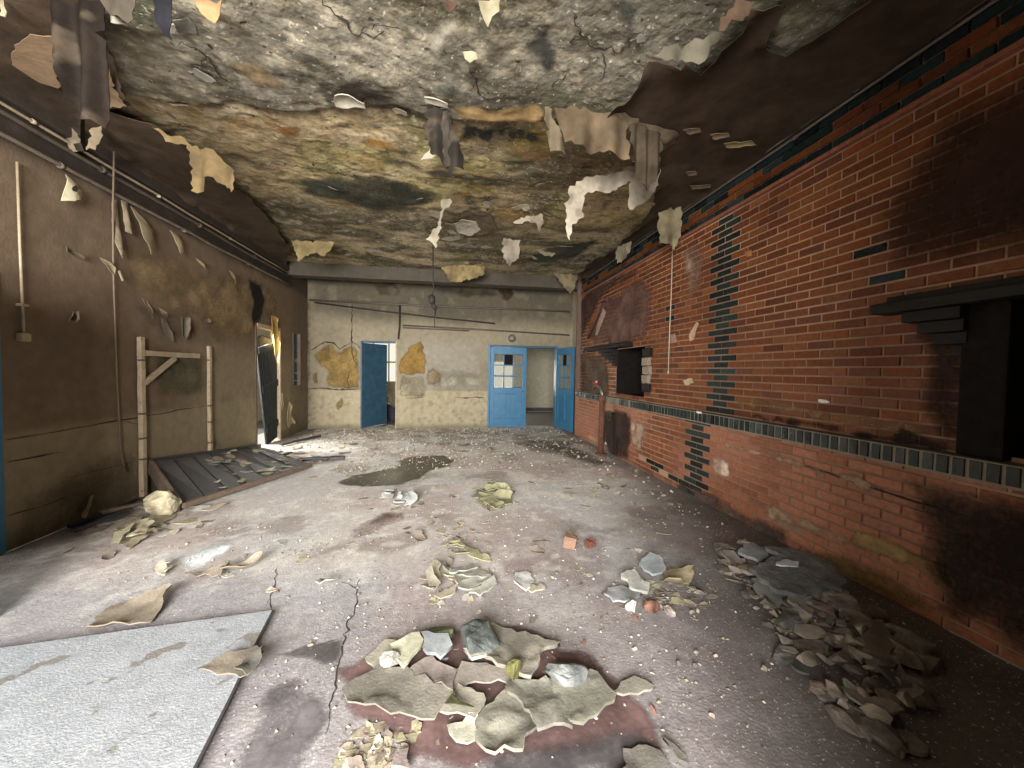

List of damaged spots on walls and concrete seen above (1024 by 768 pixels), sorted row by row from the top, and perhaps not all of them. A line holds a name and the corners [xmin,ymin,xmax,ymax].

crack [322,0,403,39]
peeling [0,0,365,269]
spalling [334,81,407,116]
peeling [420,0,991,294]
water stain [296,175,433,211]
peeling [100,200,156,281]
crack [309,303,361,390]
water stain [340,455,453,486]
crack [323,578,361,733]